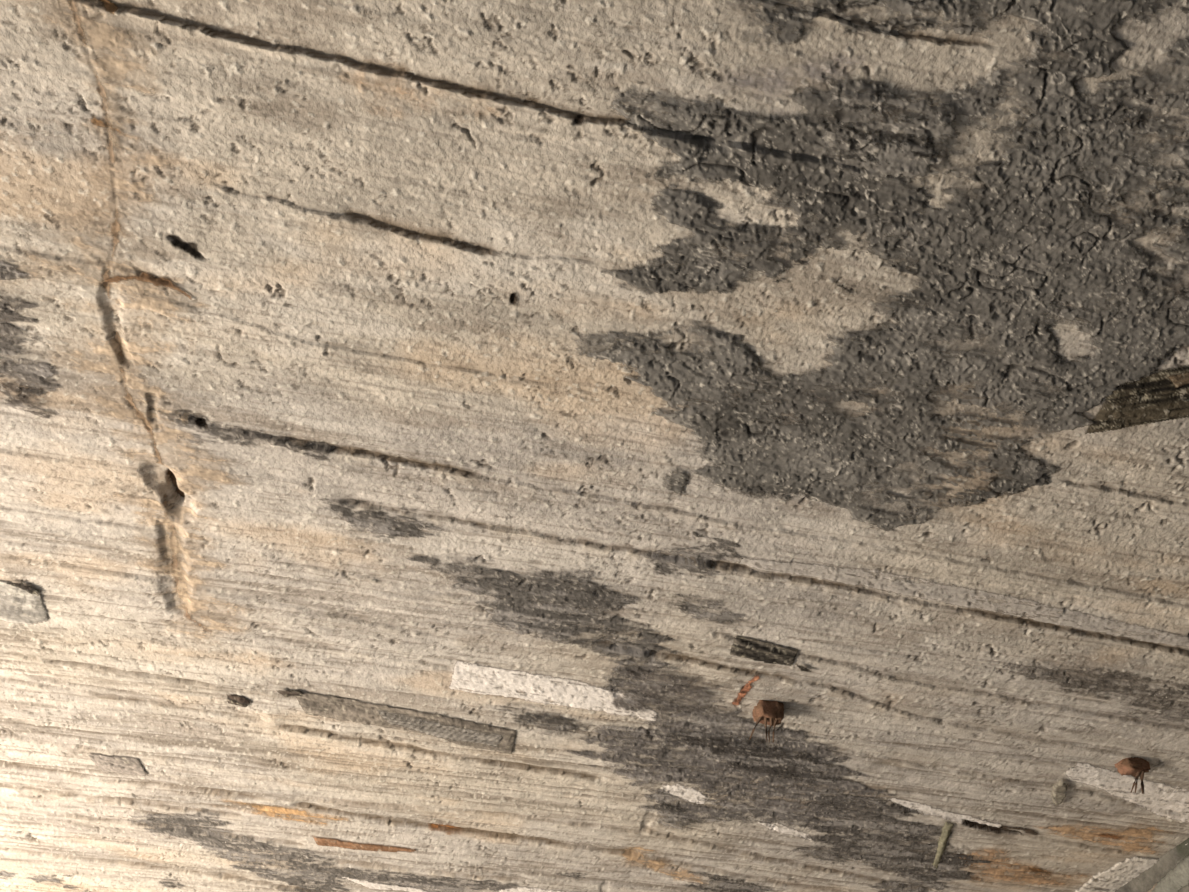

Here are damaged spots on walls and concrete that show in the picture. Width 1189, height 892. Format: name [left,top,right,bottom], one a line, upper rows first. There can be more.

crack [68,0,122,163]
crack [102,211,191,299]
crack [115,332,208,631]
damp [612,668,720,714]
damp [498,706,586,735]
damp [667,732,837,786]
damp [639,799,696,829]